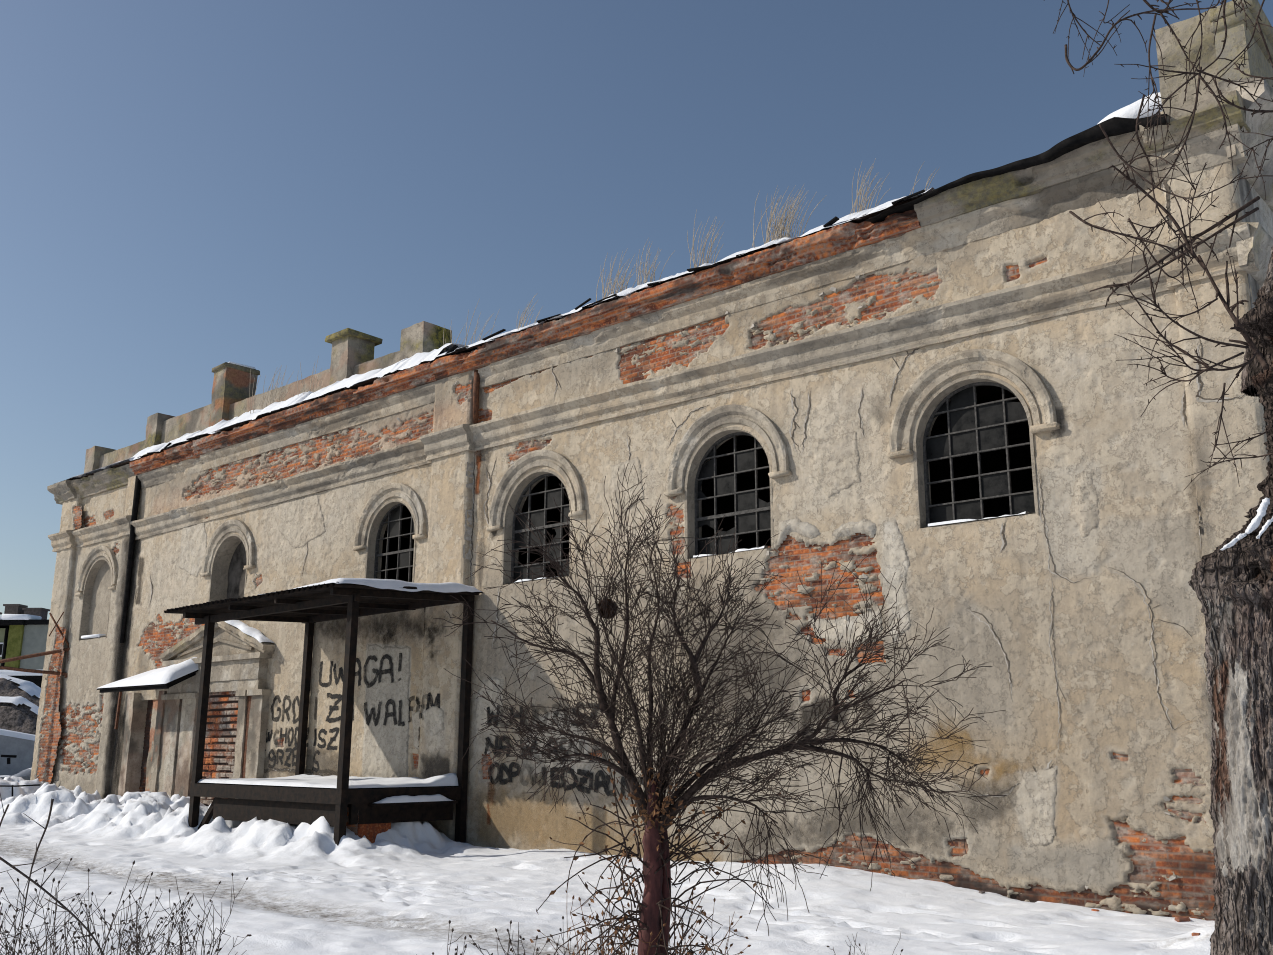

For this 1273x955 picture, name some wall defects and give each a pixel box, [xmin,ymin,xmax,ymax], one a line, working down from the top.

flaking render [614,311,729,384]
flaking render [748,268,942,350]
flaking render [185,410,434,501]
crack [789,387,812,454]
flaking render [754,520,910,663]
flaking render [138,614,205,669]
crack [952,471,1208,798]
flaking render [34,624,104,787]
peeling [1015,766,1058,848]
flaking render [1163,769,1206,823]
flaking render [736,820,1216,921]